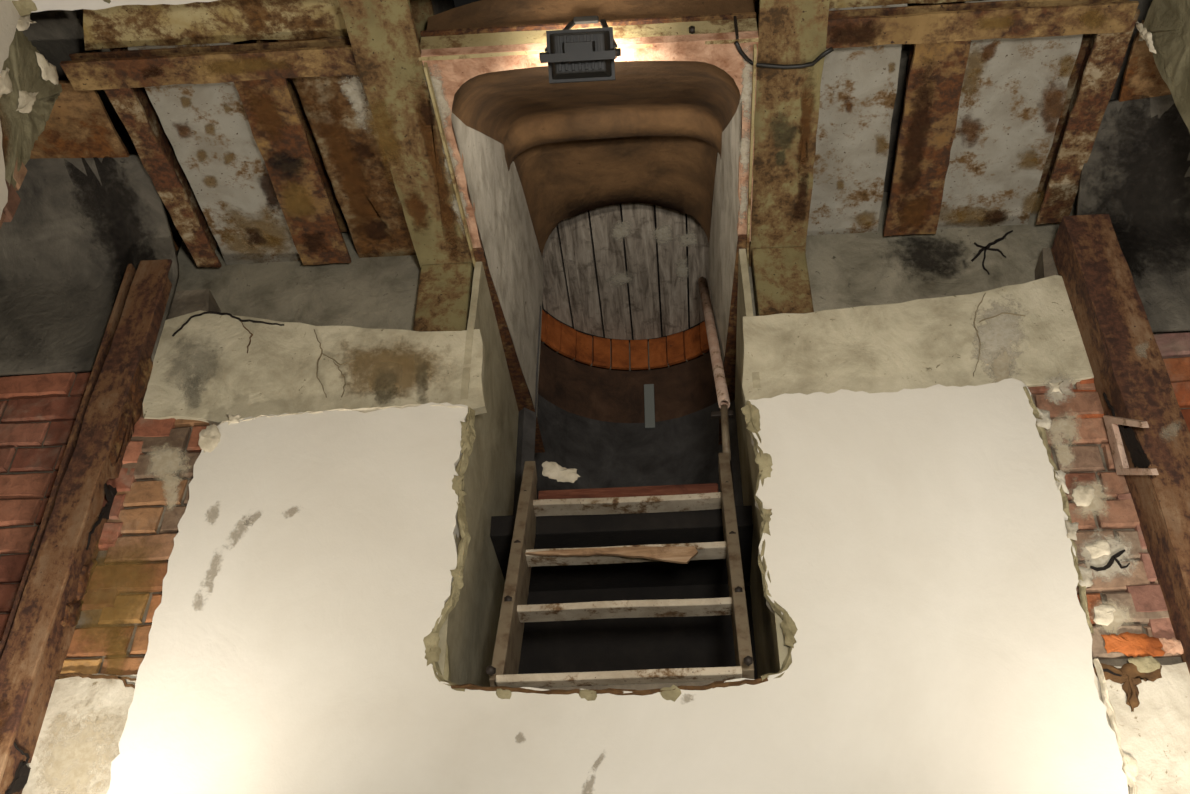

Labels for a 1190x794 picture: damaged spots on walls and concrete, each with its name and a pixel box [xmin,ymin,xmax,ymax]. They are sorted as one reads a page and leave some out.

spalling [0,0,62,228]
crack [172,311,284,353]
crack [314,330,356,398]
rust [405,95,459,254]
rust [794,84,814,219]
rust [899,73,933,230]
crack [971,230,1026,376]
rust [1041,58,1074,133]
leakage [1112,224,1144,277]
flaking render [0,372,92,641]
flaking render [59,401,798,702]
flaking render [1023,378,1184,794]